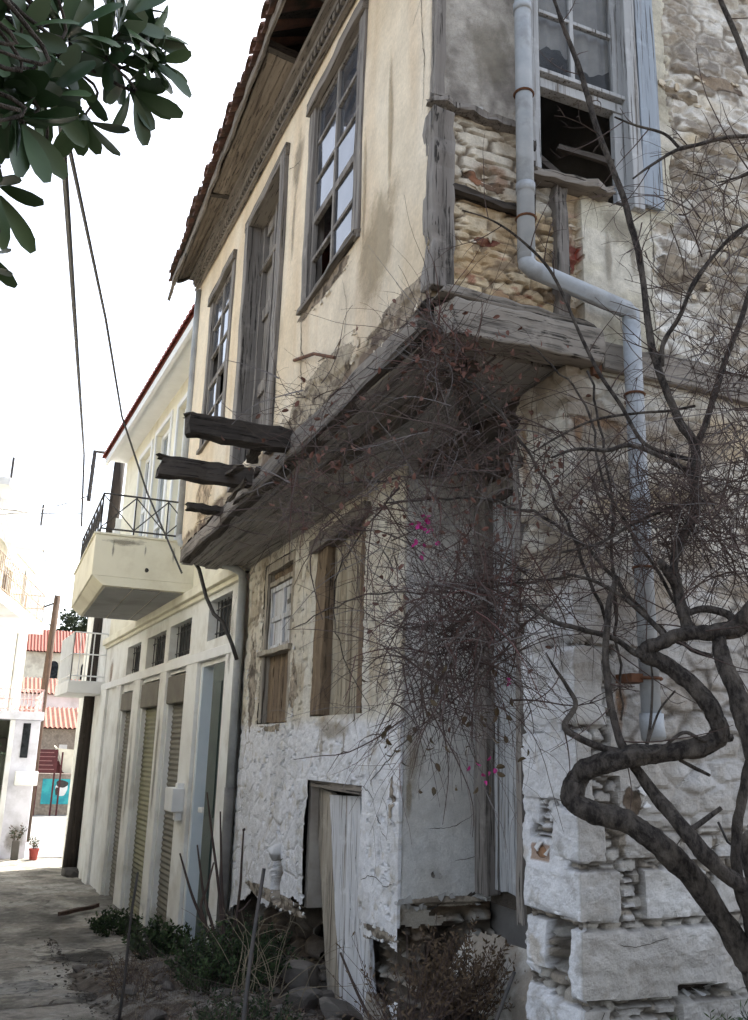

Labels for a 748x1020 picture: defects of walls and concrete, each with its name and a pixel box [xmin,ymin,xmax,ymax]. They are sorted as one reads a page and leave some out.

spalling [461,168,505,194]
flaking render [469,234,500,247]
flaking render [569,223,584,274]
spalling [281,276,421,428]